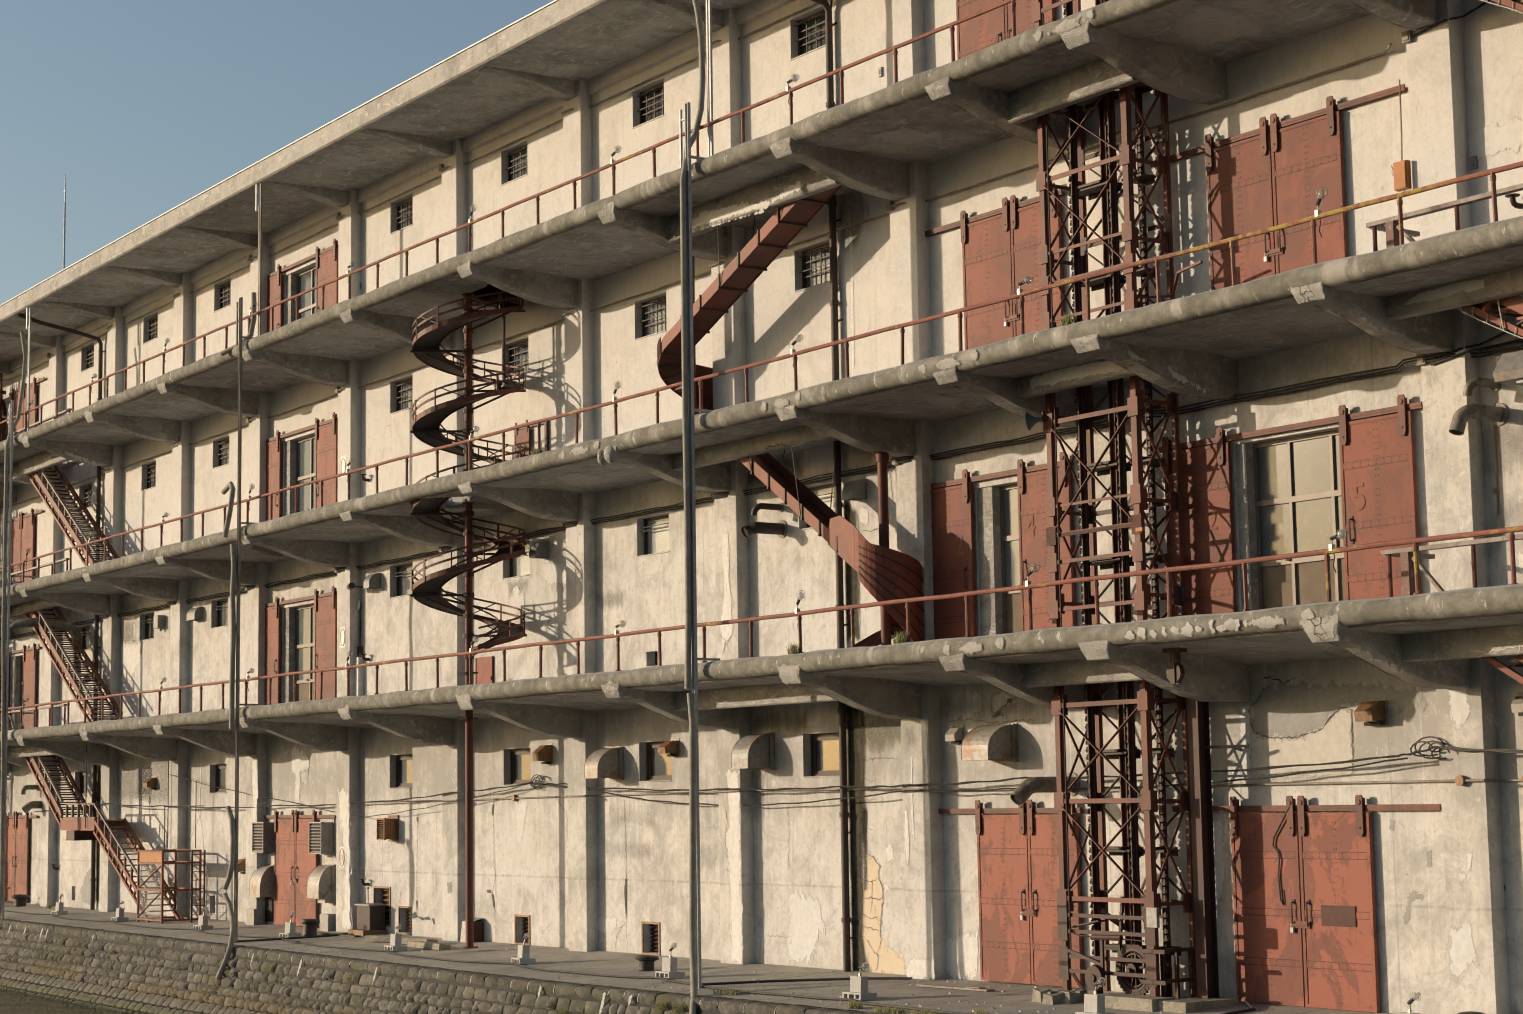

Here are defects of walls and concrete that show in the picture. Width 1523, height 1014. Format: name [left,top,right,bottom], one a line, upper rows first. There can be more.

peeling [862,843,1056,1014]